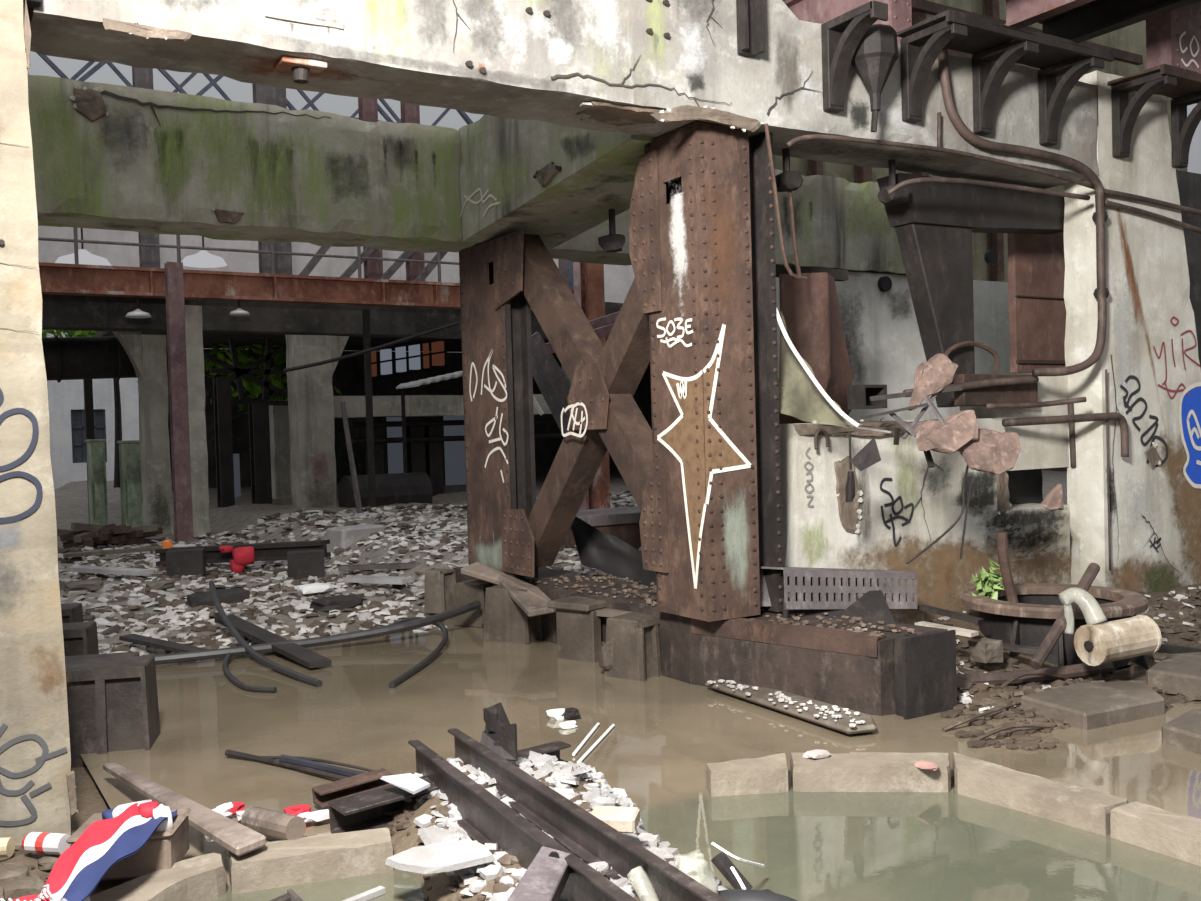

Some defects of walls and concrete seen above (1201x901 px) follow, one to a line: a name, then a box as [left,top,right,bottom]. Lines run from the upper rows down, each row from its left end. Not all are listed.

crack [453,0,470,52]
spalling [69,84,110,122]
crack [550,54,732,107]
crack [767,71,821,115]
damp [670,193,687,273]
corrosion [1121,225,1142,316]